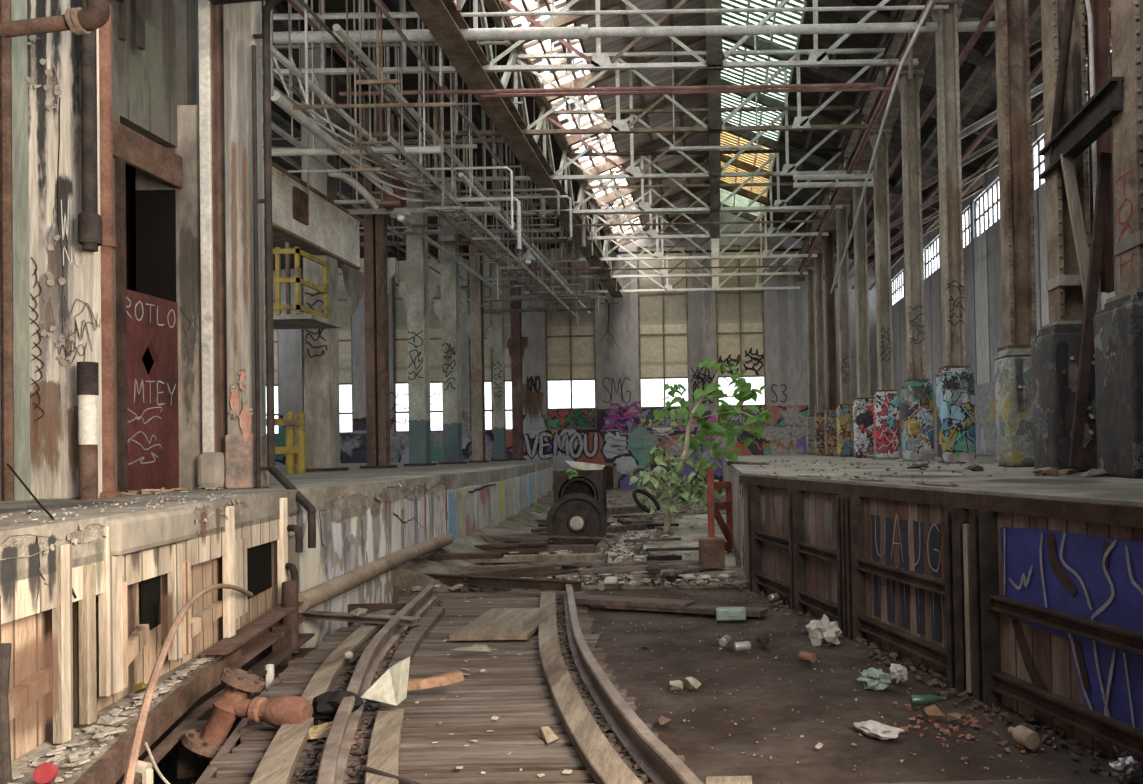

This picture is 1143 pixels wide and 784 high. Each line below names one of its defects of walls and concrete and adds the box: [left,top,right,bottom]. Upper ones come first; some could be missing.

damp [27,0,80,19]
damp [27,31,81,345]
damp [1,535,56,610]